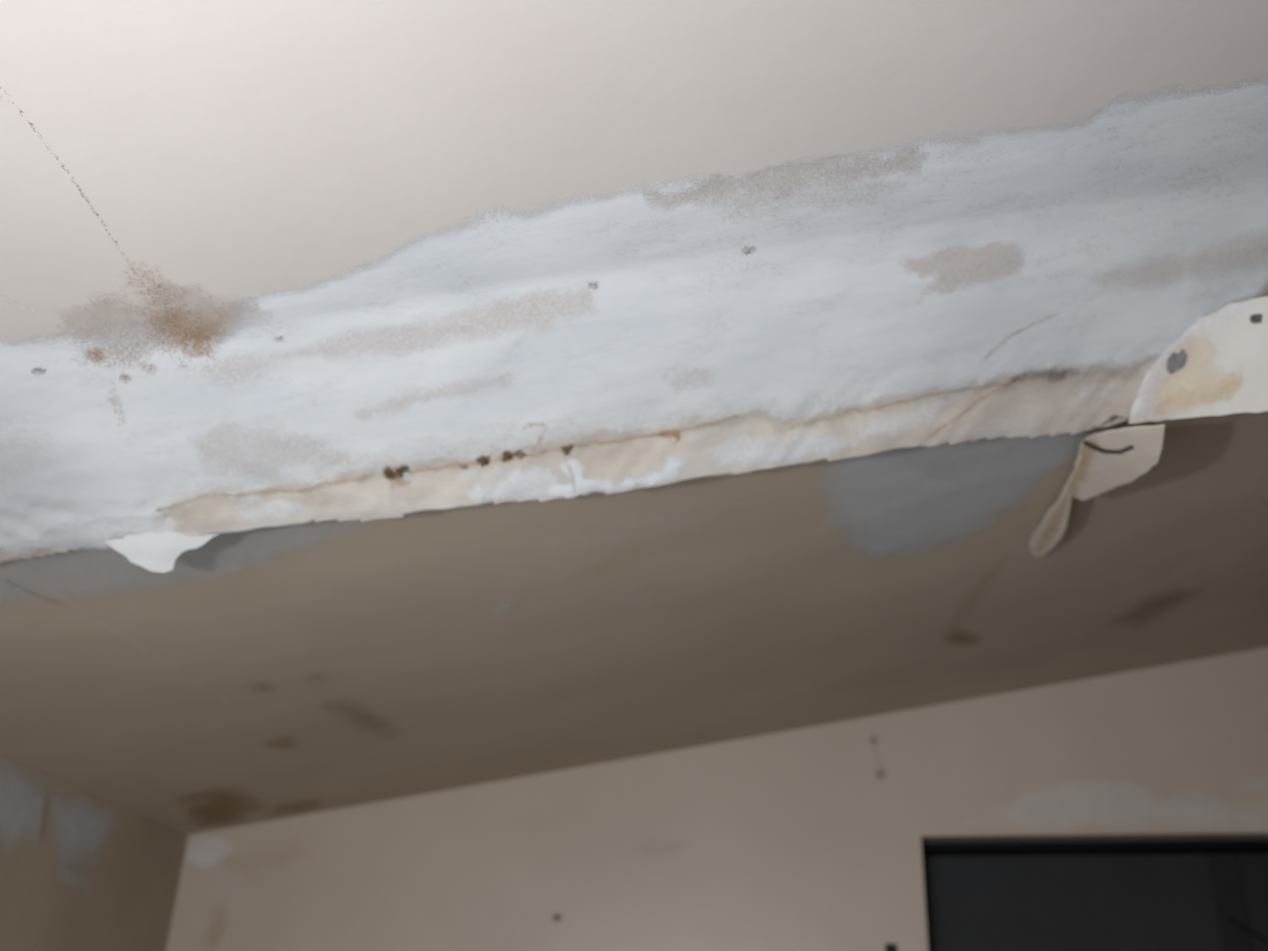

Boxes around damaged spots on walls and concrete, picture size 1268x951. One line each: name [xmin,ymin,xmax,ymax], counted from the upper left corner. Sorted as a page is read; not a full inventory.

damp [53,262,600,426]
peeling [1,353,1163,573]
damp [127,325,1246,553]
damp [899,240,1027,304]